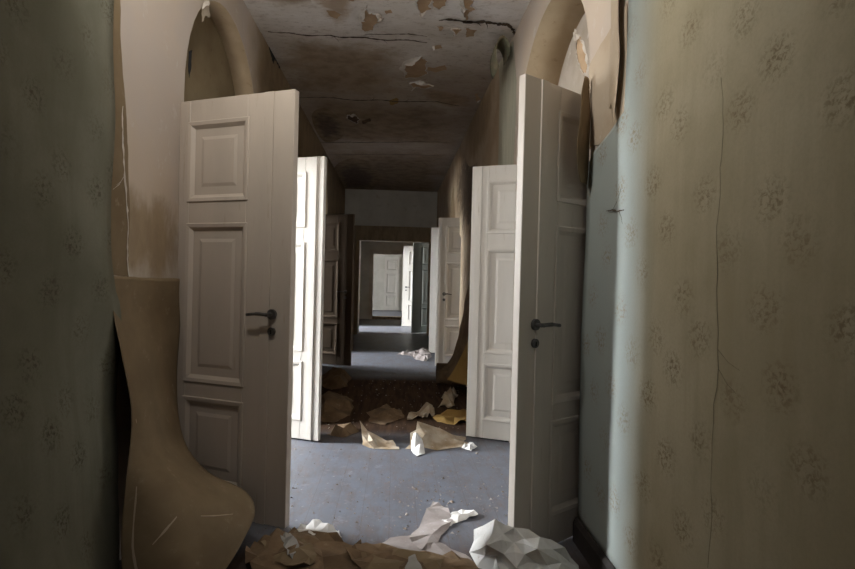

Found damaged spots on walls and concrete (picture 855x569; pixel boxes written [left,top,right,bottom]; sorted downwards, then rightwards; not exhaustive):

peeling [359,4,392,32]
peeling [415,0,446,17]
peeling [437,0,477,37]
crack [268,18,515,69]
peeling [399,45,447,91]